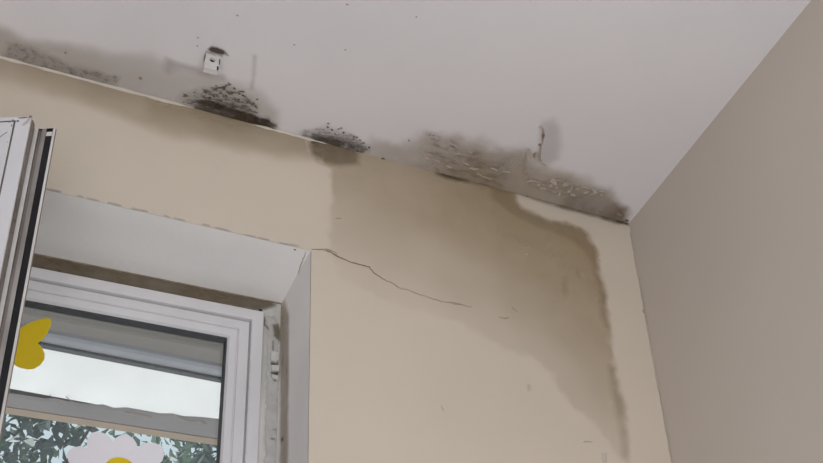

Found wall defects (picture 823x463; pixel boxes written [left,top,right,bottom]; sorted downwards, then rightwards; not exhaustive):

water stain [151,82,276,129]
water stain [311,123,370,152]
water stain [423,154,629,303]
crack [298,249,470,307]